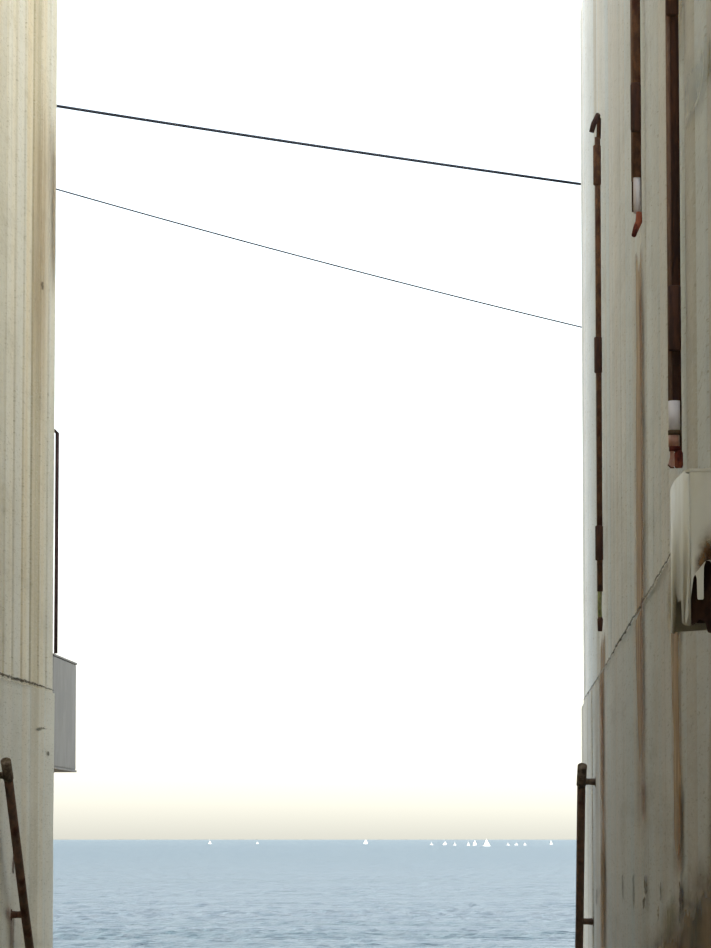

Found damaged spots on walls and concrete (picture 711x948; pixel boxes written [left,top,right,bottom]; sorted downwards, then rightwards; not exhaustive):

corrosion [697,540,711,569]
corrosion [671,632,681,859]